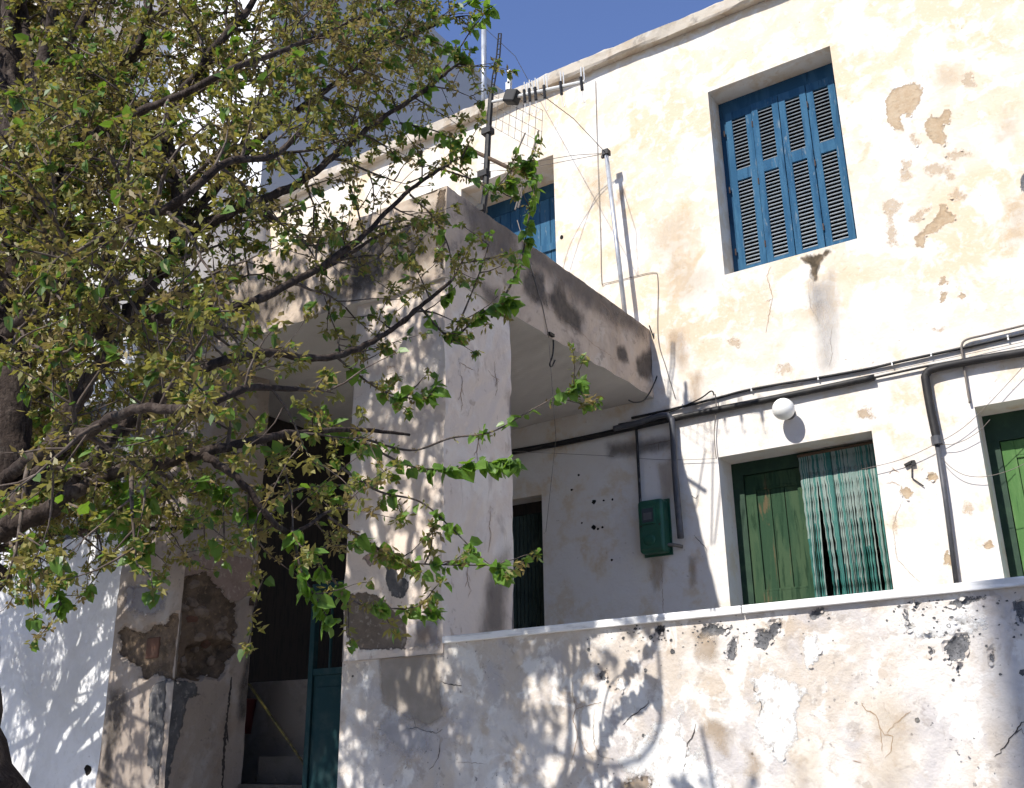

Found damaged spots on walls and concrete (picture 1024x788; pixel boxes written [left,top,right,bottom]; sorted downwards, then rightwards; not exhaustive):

peeling [883,83,966,248]
leakage [524,247,644,332]
leakage [801,250,829,281]
leakage [617,347,652,379]
spalling [118,554,255,684]
spalling [344,592,440,650]
spalling [611,614,796,670]
peeling [886,592,1024,682]
crack [855,705,911,763]